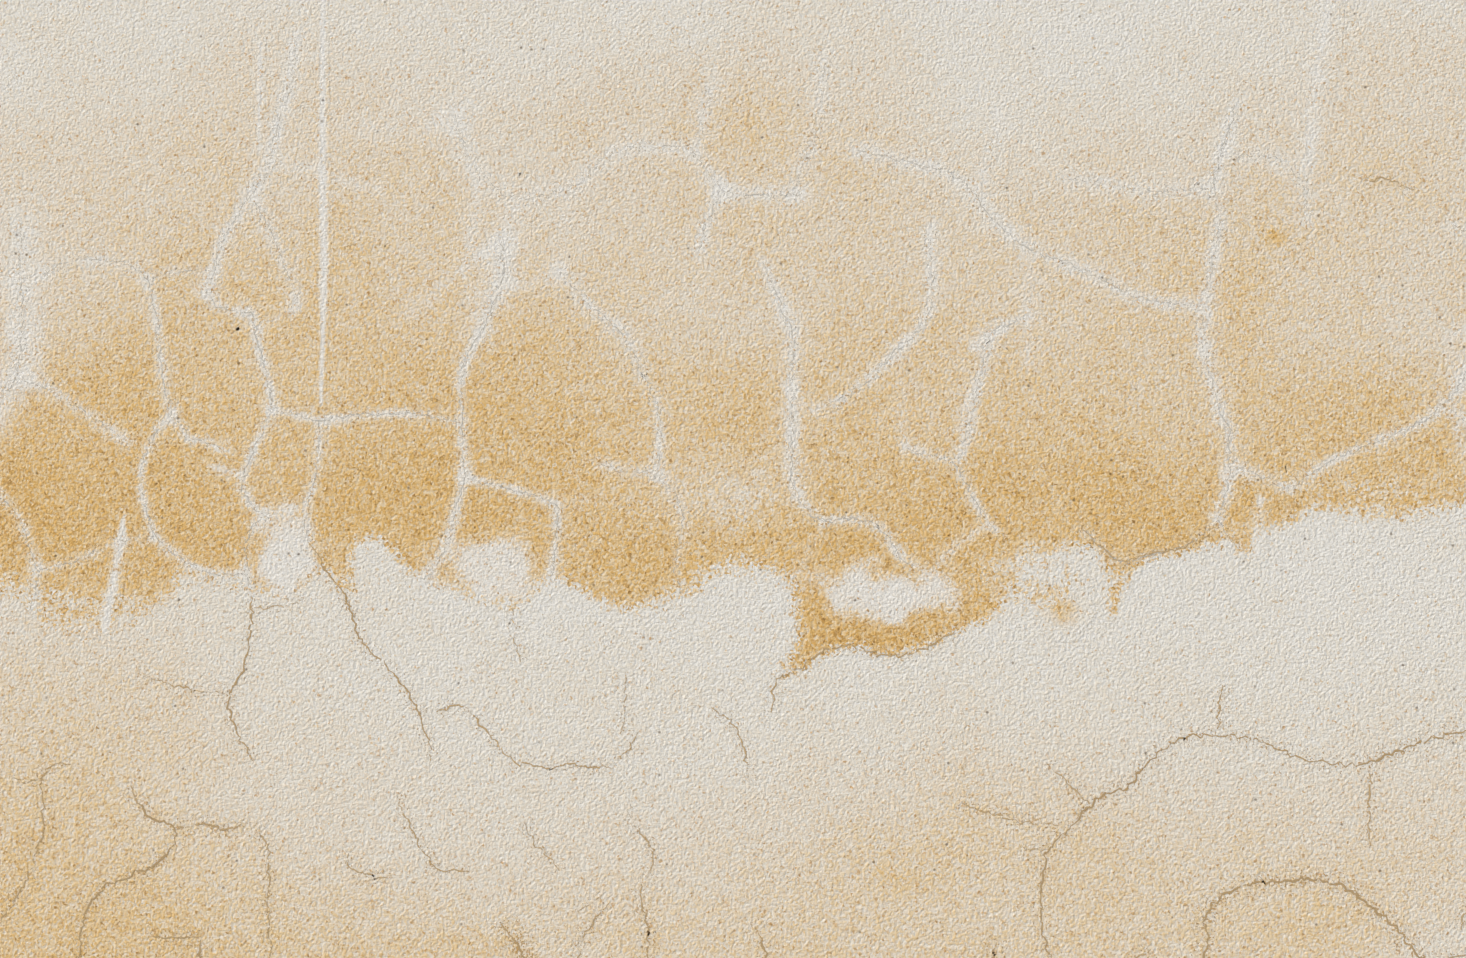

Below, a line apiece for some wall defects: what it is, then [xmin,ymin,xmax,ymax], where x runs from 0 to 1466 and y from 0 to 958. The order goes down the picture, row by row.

crack [0,758,72,926]
damp [95,505,131,642]
crack [70,783,278,958]
crack [0,17,639,776]
damp [276,0,452,414]
crack [339,794,469,884]
crack [492,807,661,958]
damp [0,534,1466,958]
damp [168,172,1466,858]
crack [712,235,1053,783]
crack [958,685,1466,958]
damp [1229,0,1466,466]